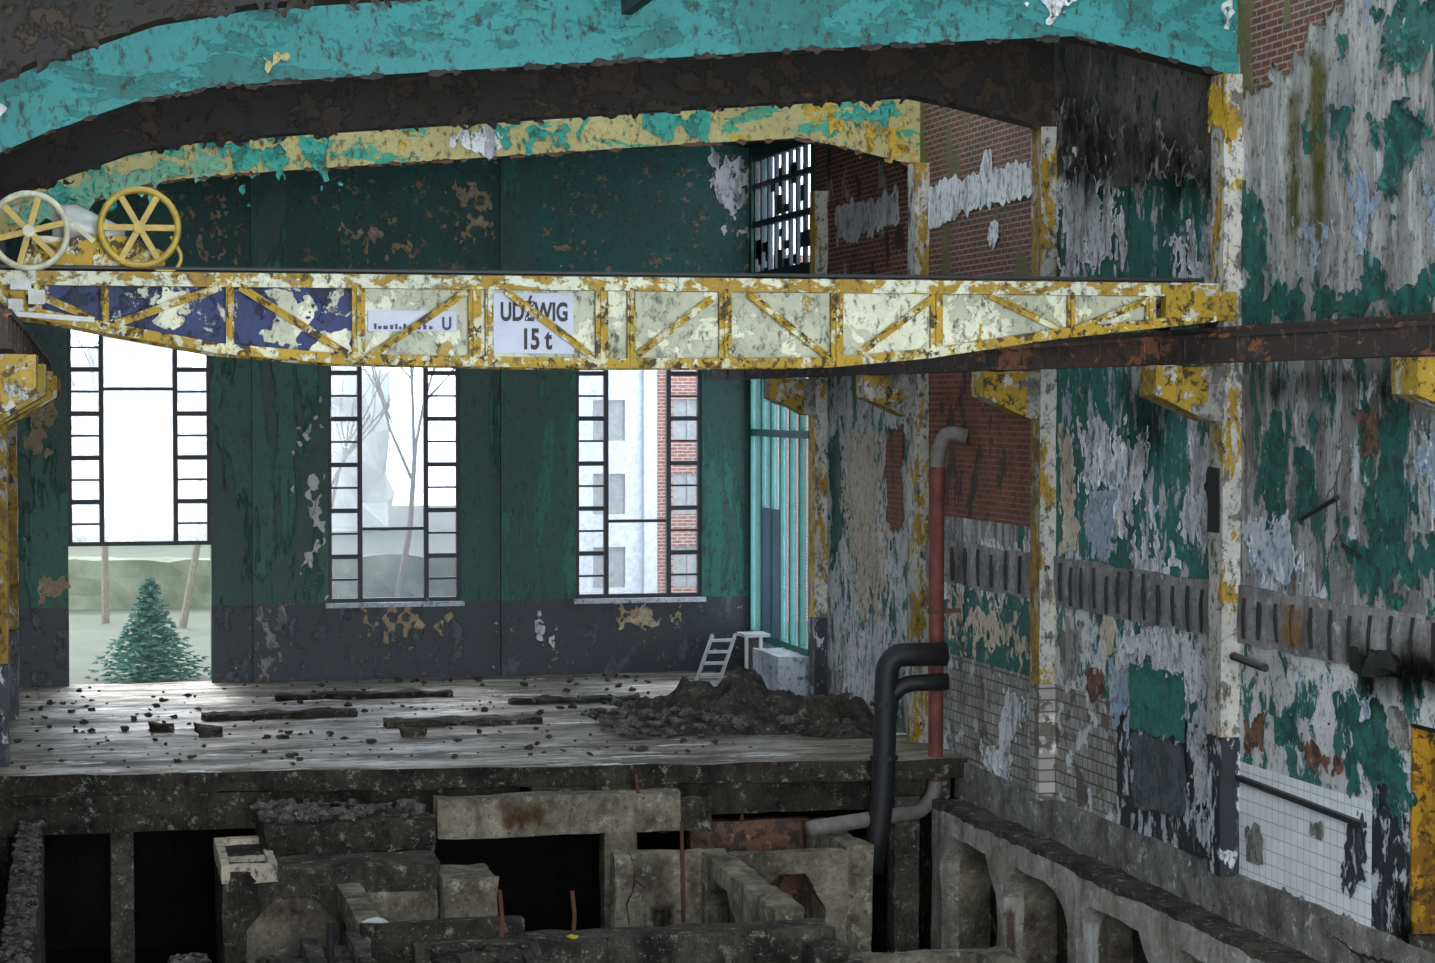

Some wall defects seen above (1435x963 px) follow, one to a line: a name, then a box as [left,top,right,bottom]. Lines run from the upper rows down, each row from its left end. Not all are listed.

peeling [8,99,749,274]
damp [1064,116,1115,195]
damp [1129,141,1196,203]
flaking render [1024,0,1348,283]
peeling [1240,0,1435,325]
flaking render [838,601,894,715]
flaking render [1057,394,1210,816]
peeling [1241,395,1435,921]
spalling [44,833,111,951]
spalling [133,828,255,963]
spalling [435,833,601,929]
spalling [637,831,687,850]